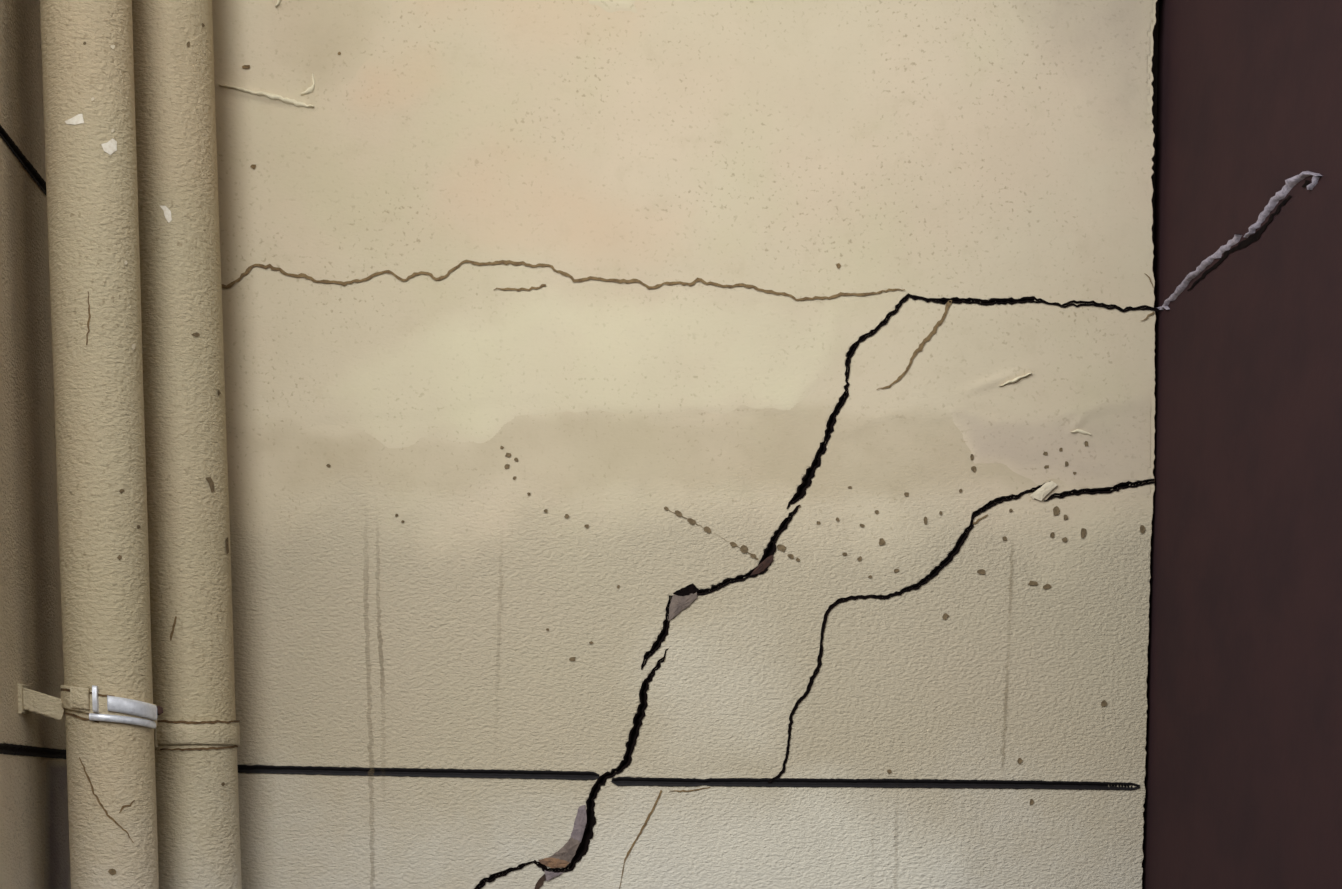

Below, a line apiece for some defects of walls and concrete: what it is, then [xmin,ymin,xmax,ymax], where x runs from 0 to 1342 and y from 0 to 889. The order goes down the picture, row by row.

crack [221,171,1322,889]
spalling [668,583,699,621]
spalling [539,805,587,881]